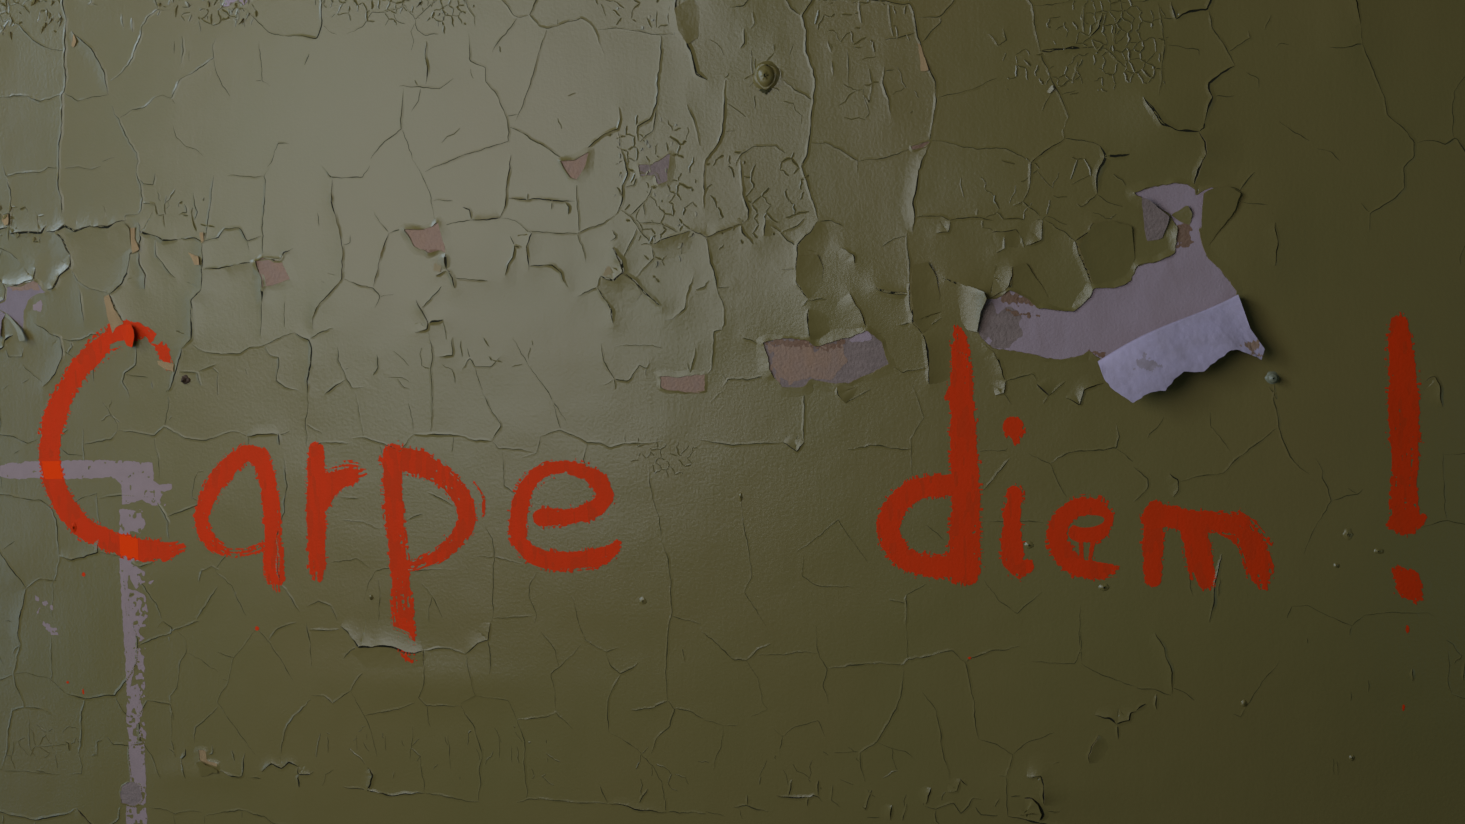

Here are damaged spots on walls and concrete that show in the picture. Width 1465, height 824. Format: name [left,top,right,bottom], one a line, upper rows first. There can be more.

peeling [556,147,595,185]
peeling [0,278,49,341]
peeling [250,249,299,291]
peeling [398,216,452,259]
peeling [912,177,1265,403]
peeling [756,324,896,397]
crack [1423,374,1444,408]
crack [193,286,1070,824]
crack [1187,554,1223,622]
crack [0,470,218,780]
crack [1085,694,1159,763]
crack [0,806,122,824]